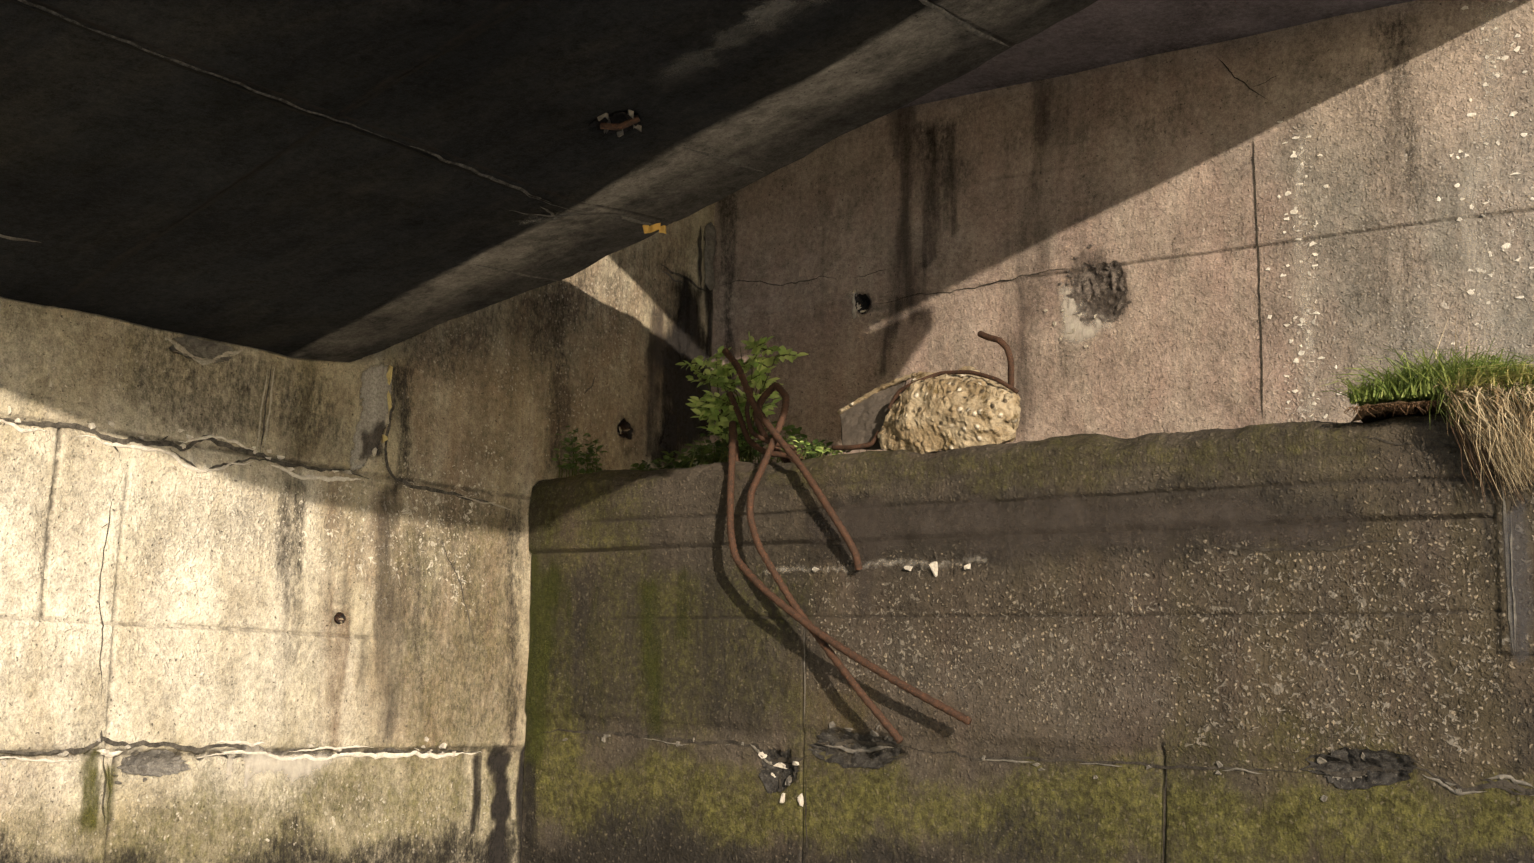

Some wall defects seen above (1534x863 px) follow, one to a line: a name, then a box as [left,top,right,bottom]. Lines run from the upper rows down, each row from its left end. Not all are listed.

spalling [746,0,796,31]
crack [0,0,1086,304]
spalling [589,109,642,137]
leakage [881,106,956,373]
spalling [1044,244,1132,348]
leakage [647,276,713,463]
crack [0,361,511,823]
spalling [111,749,203,784]
spalling [758,721,906,807]
spalling [1300,746,1417,802]
crack [1401,757,1534,796]